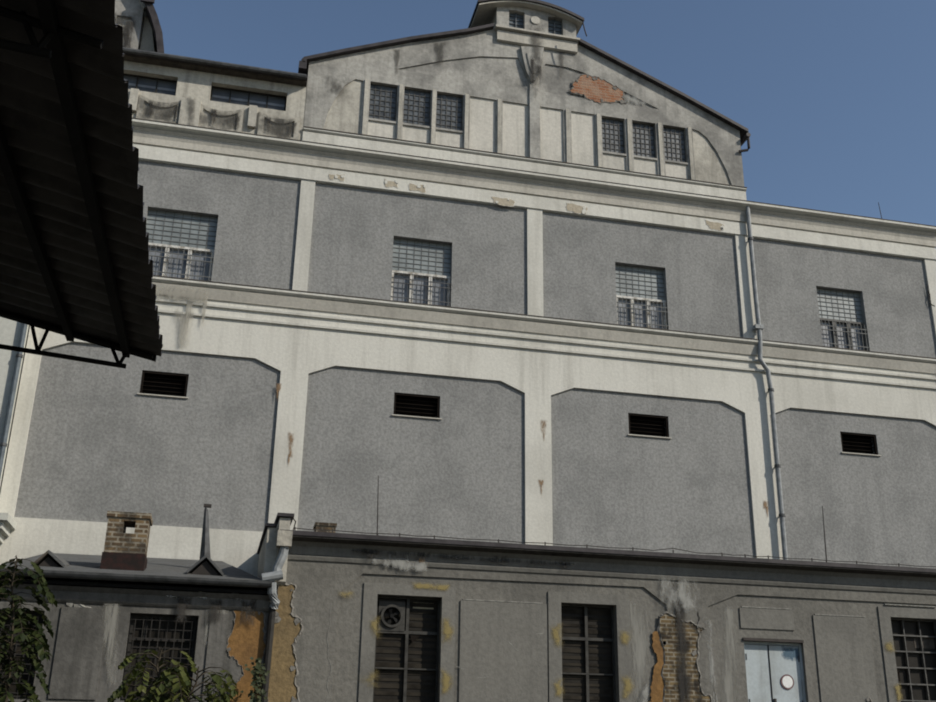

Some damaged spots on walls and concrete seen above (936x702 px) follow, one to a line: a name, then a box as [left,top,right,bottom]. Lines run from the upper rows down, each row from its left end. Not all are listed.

flaking render [568,74,626,105]
flaking render [225,583,304,702]
leakage [662,580,694,702]
flaking render [649,611,712,702]